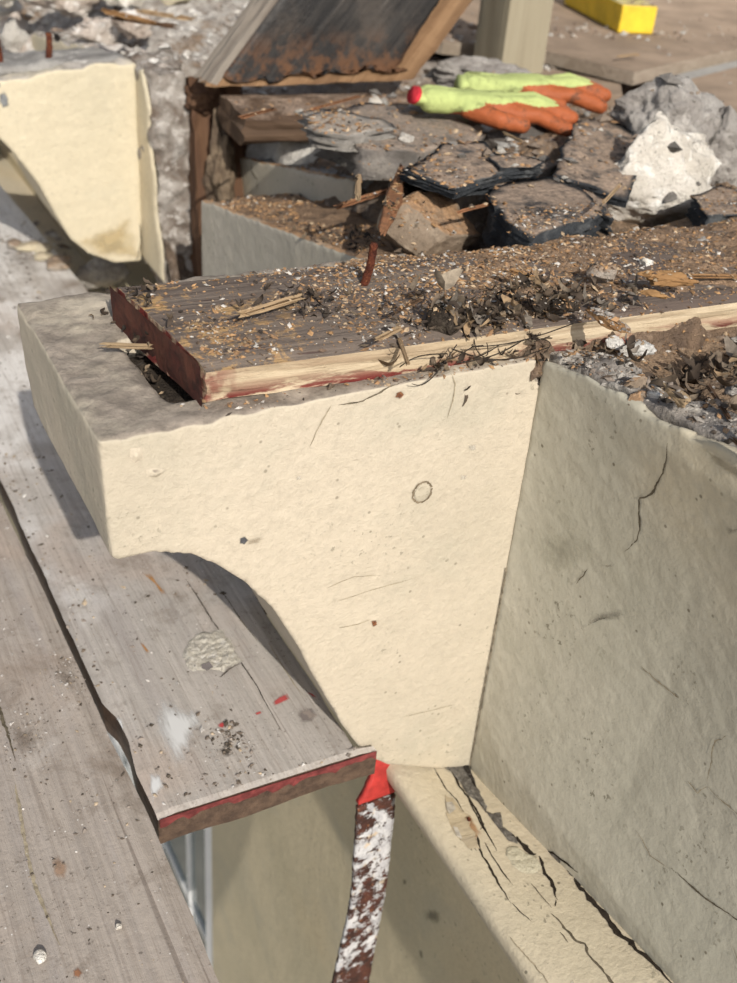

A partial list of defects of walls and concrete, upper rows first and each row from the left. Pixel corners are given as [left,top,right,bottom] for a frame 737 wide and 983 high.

crack [627,447,667,550]
crack [434,568,672,983]
crack [688,735,737,814]
crack [636,831,737,920]